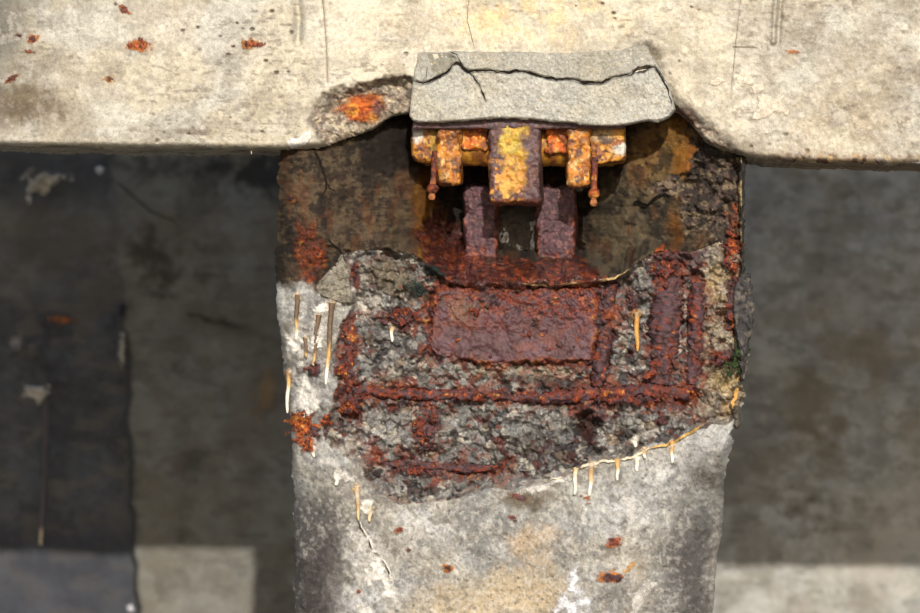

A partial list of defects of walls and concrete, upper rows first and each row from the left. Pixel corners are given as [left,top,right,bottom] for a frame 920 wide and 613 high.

corrosion [126,37,151,52]
corrosion [231,38,266,49]
crack [413,2,672,104]
spalling [287,76,413,149]
corrosion [338,94,387,122]
corrosion [295,223,326,283]
corrosion [411,210,609,291]
spalling [315,88,756,505]
corrosion [722,220,745,330]
corrosion [303,362,321,377]
corrosion [283,410,335,452]
corrosion [599,562,635,582]